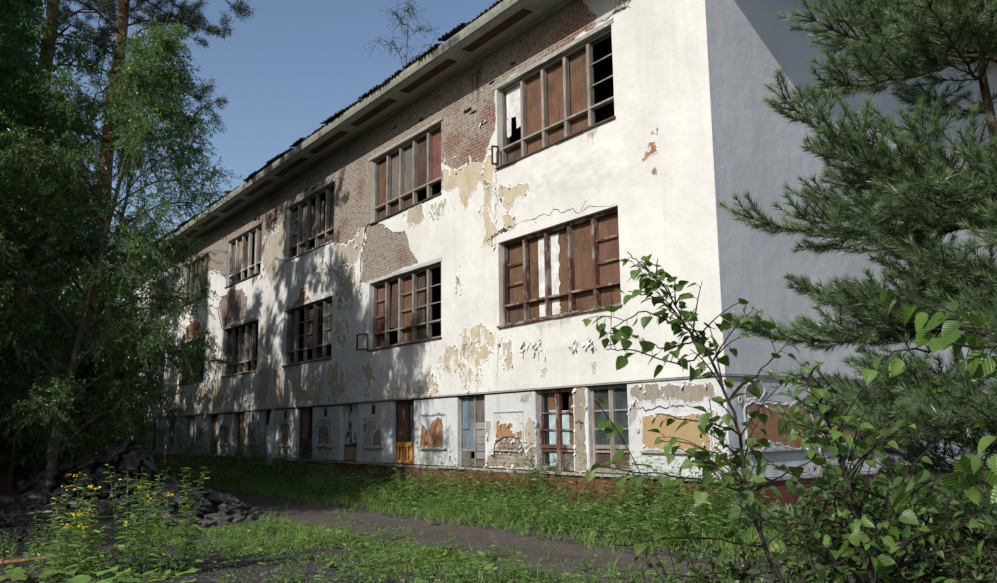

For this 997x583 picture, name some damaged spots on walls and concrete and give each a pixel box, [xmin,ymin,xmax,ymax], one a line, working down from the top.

flaking render [171,0,631,328]
peeling [641,128,659,175]
crack [487,179,612,241]
peeling [169,312,346,447]
peeling [362,417,385,450]
peeling [415,416,451,460]
peeling [361,317,548,402]
flaking render [484,416,537,472]
peeling [627,379,725,467]
peeling [737,377,822,456]